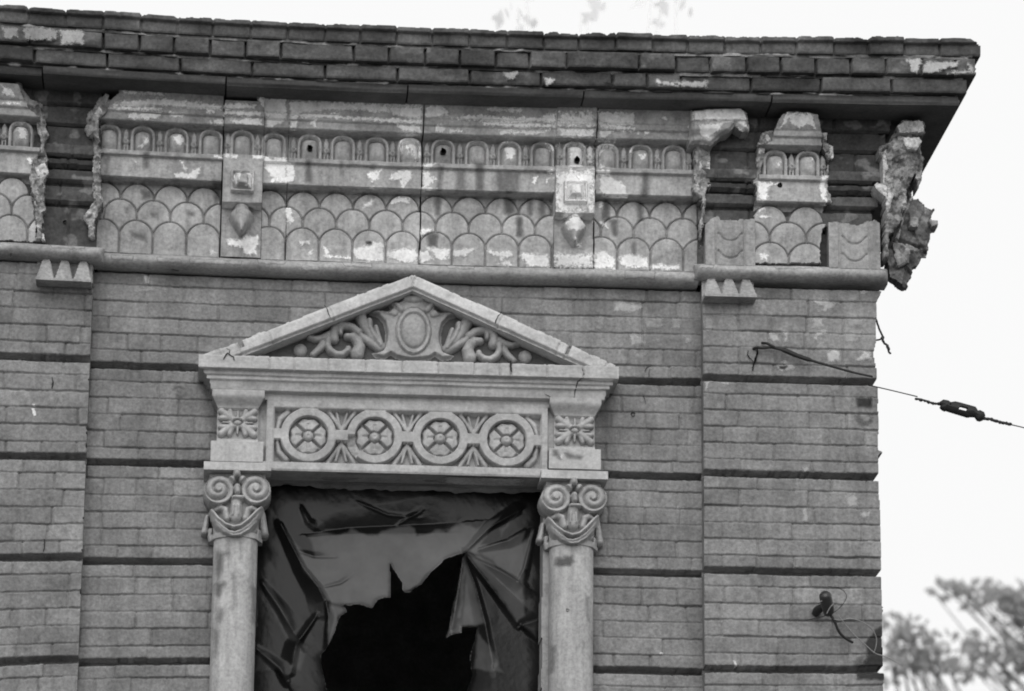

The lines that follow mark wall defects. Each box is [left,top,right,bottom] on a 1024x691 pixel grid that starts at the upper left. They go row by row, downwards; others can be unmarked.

peeling [1,82,680,279]
spalling [687,108,749,248]
spalling [870,119,938,291]